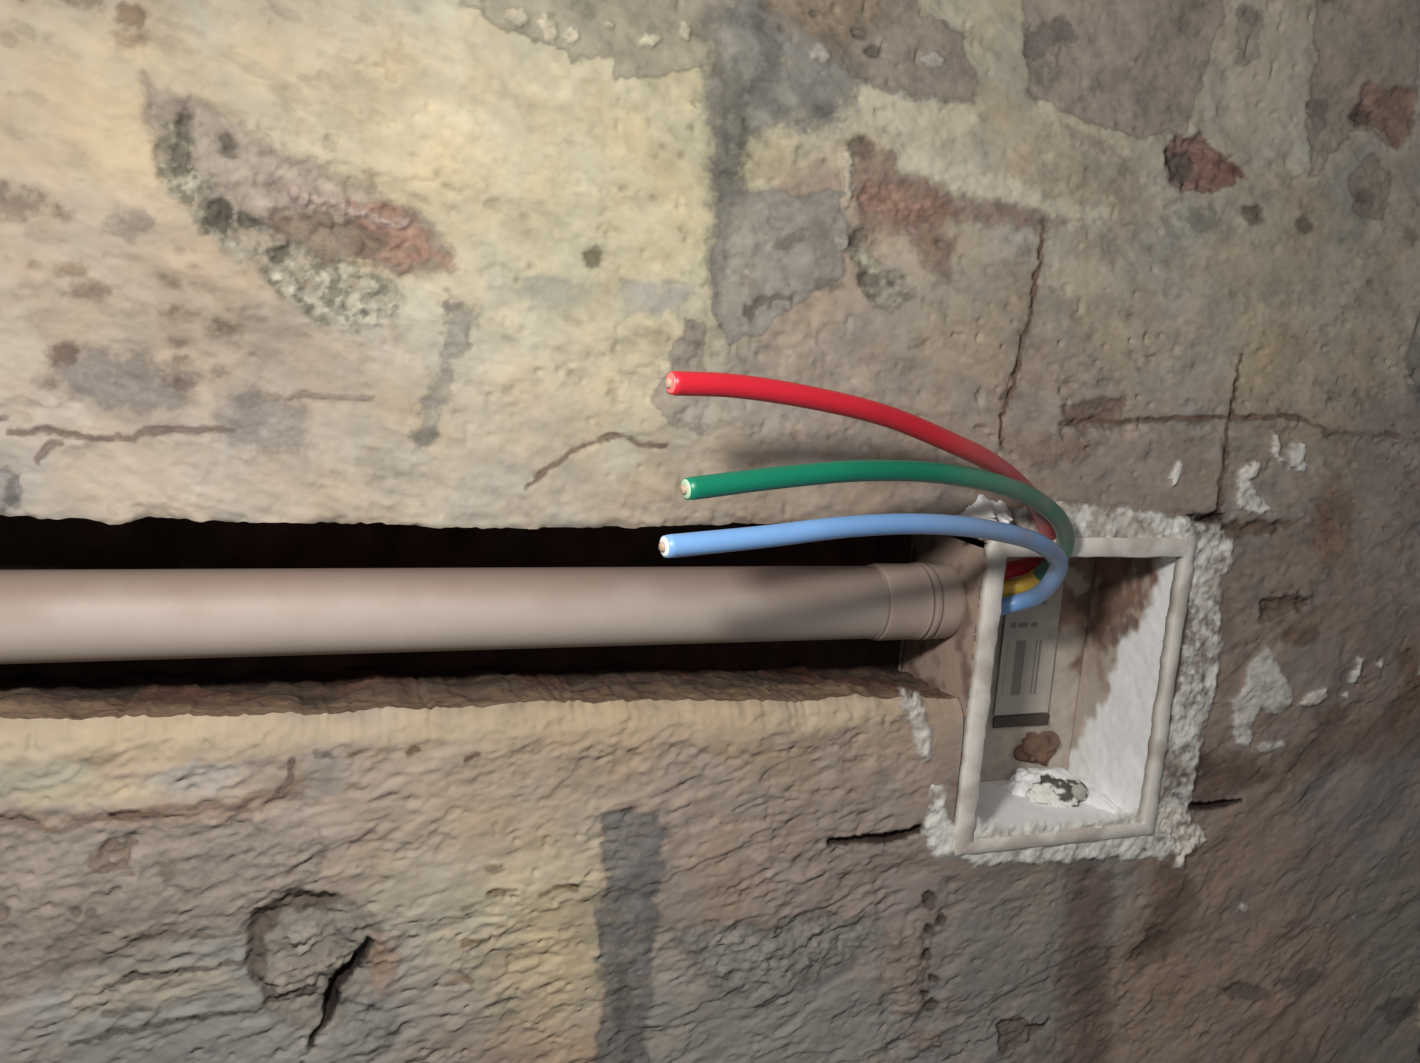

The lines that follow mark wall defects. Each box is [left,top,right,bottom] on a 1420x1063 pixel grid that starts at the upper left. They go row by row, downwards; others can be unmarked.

flaking render [460,0,740,80]
damp [702,0,857,313]
flaking render [762,0,978,102]
flaking render [1022,0,1263,194]
flaking render [1305,0,1420,219]
crack [0,417,233,463]
crack [263,390,373,400]
crack [999,224,1044,448]
crack [1058,353,1419,524]
flaking render [1405,315,1420,391]
flaking render [0,818,400,1054]
damp [594,808,669,1063]